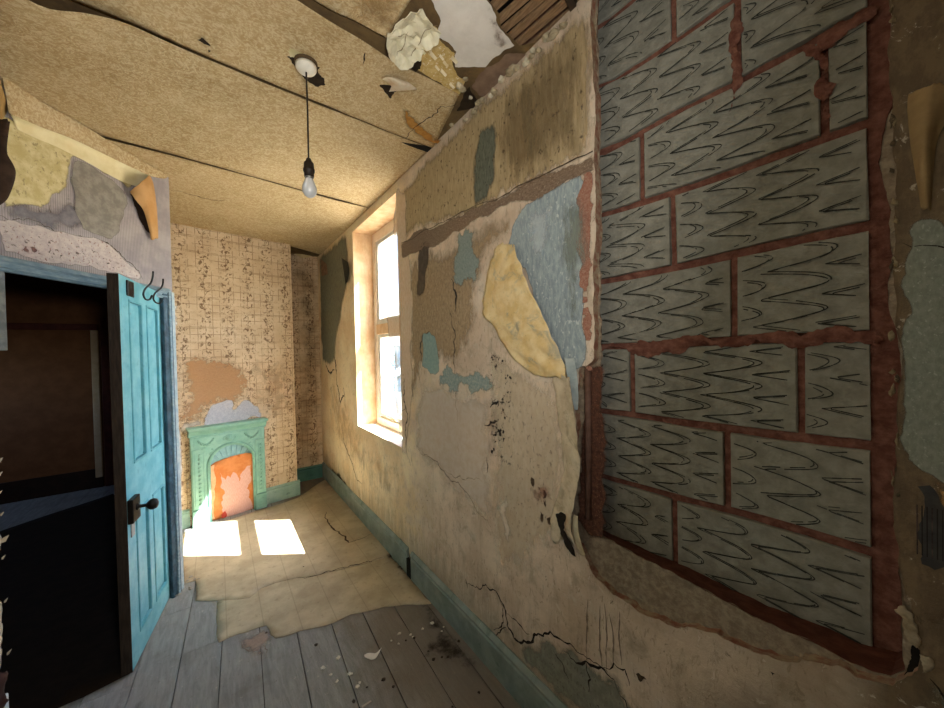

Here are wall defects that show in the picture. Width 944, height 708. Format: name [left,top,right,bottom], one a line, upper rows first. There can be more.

peeling [380,77,417,99]
flaking render [432,0,526,111]
peeling [320,238,349,363]
flaking render [385,190,493,452]
spalling [509,0,944,686]
crack [465,578,630,708]